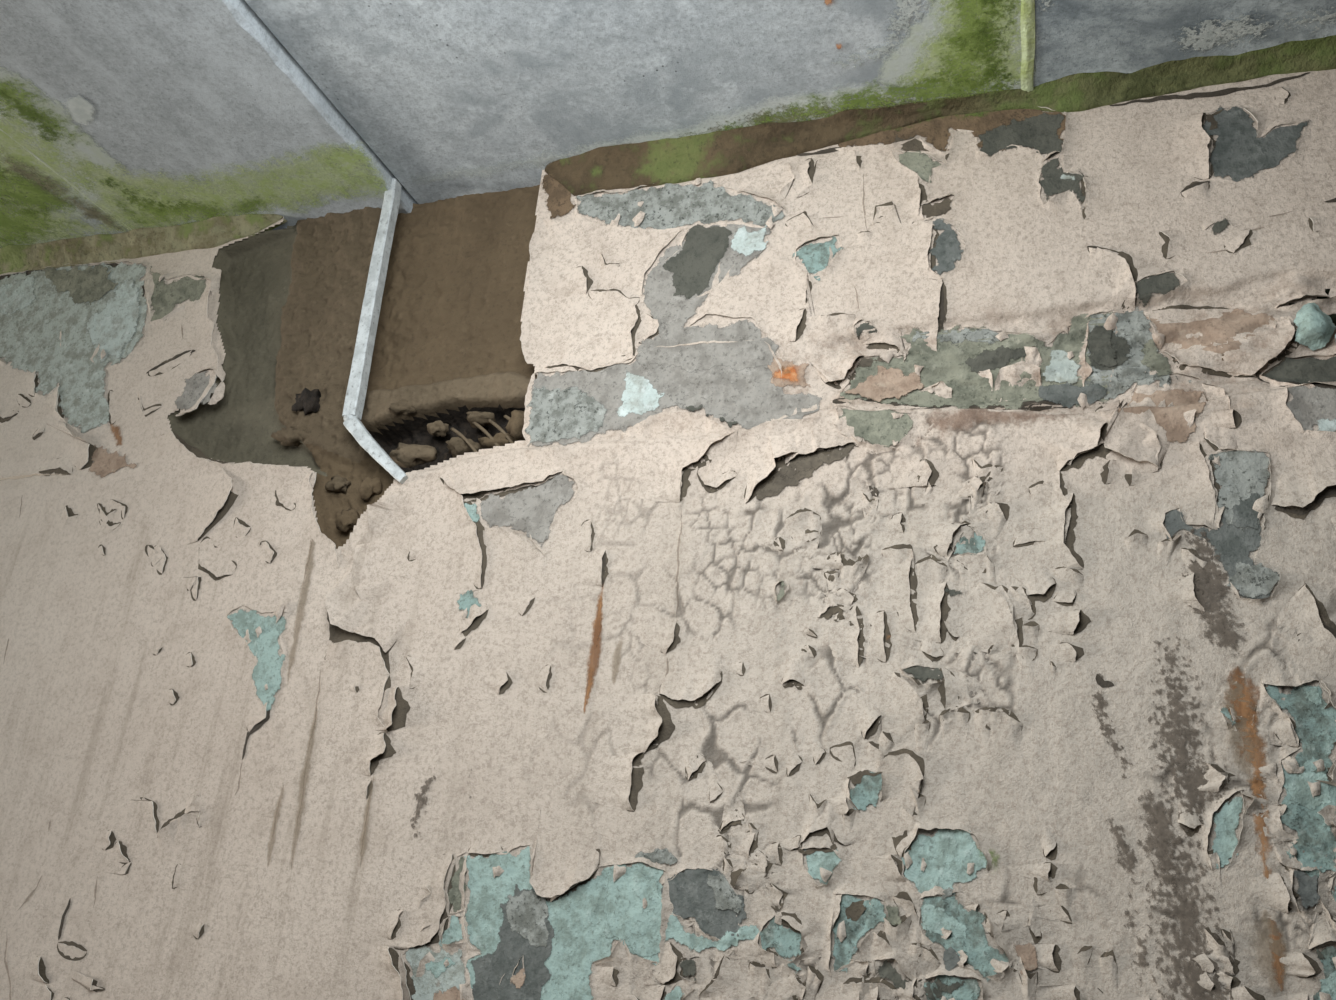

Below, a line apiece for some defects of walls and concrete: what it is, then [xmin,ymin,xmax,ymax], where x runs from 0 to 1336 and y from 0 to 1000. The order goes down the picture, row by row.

water stain [708,0,1021,131]
water stain [0,80,386,248]
peeling [797,106,1126,281]
peeling [1137,102,1311,259]
flaking render [0,207,447,776]
rust [584,588,603,713]
flaking render [357,163,1336,1000]
peeling [85,829,131,875]
peeling [129,783,221,889]
rust [1227,666,1272,879]
peeling [5,941,105,1000]
rust [1268,920,1285,991]